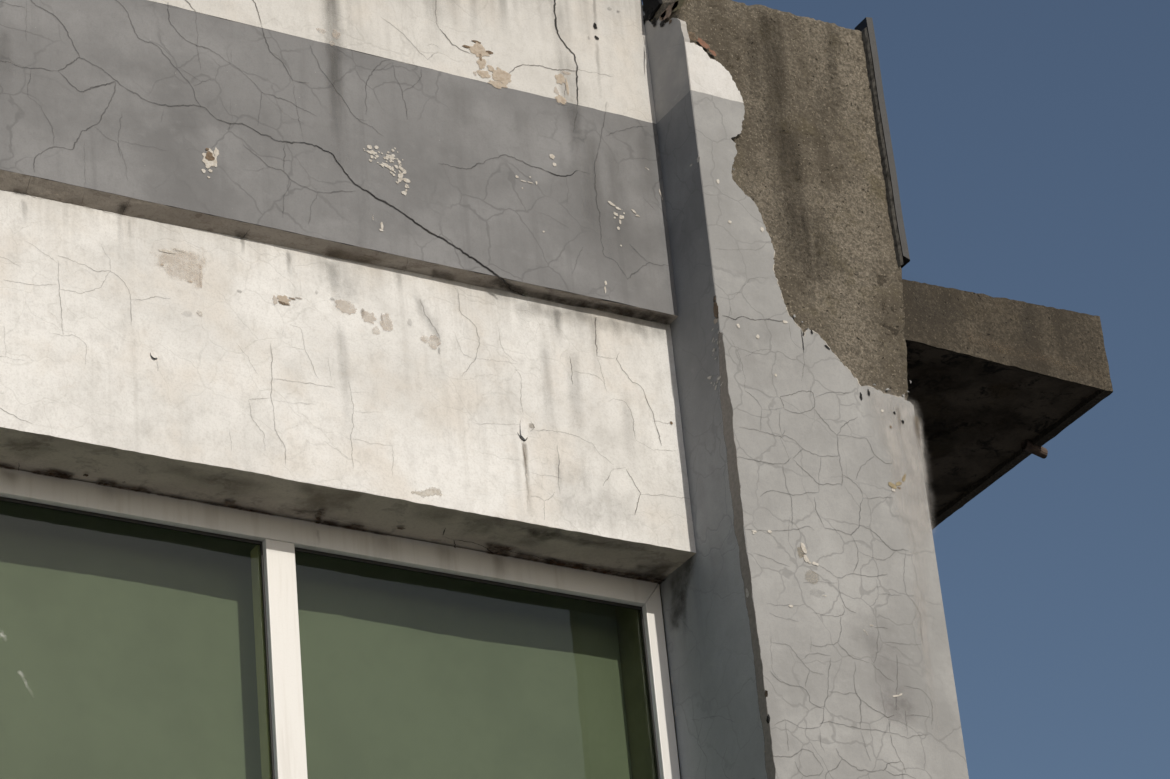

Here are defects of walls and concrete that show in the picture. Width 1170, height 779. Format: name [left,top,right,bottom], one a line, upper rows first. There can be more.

peeling [463,40,511,89]
crack [511,0,578,104]
spalling [201,147,219,178]
crack [241,123,506,283]
peeling [363,145,410,195]
spalling [642,0,912,400]